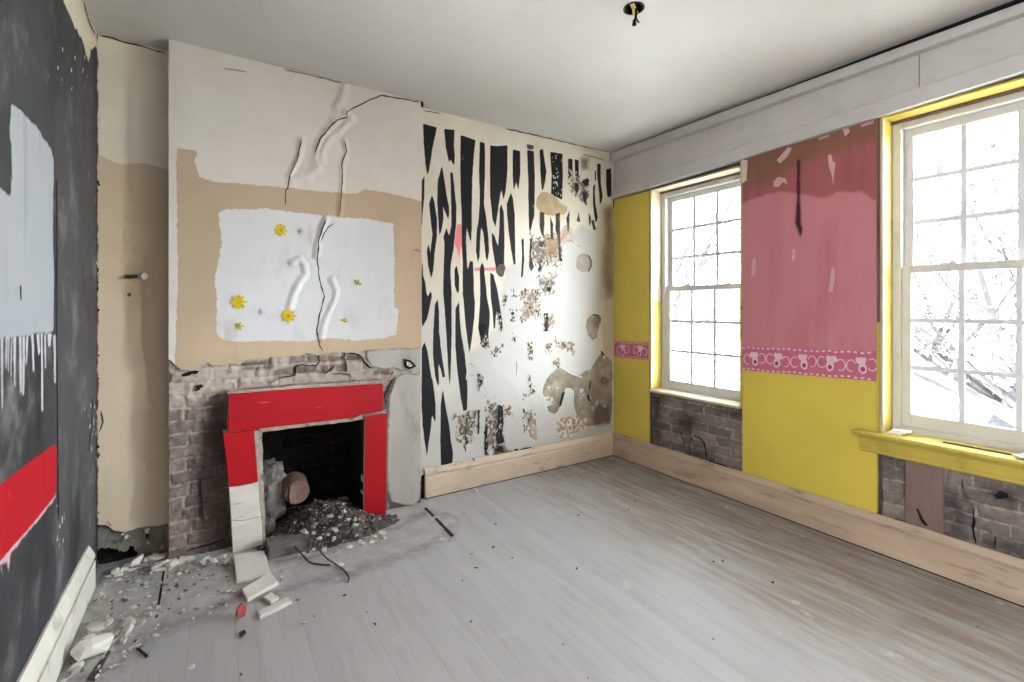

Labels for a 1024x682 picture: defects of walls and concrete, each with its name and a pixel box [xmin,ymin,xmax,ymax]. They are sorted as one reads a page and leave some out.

crack [507,129,606,161]
crack [269,95,440,402]
flaking render [452,155,612,461]
flaking render [99,533,137,564]
flaking render [169,348,421,559]
flaking render [651,392,742,472]
flaking render [882,455,905,522]
crack [961,479,996,549]
flaking render [944,469,1024,559]